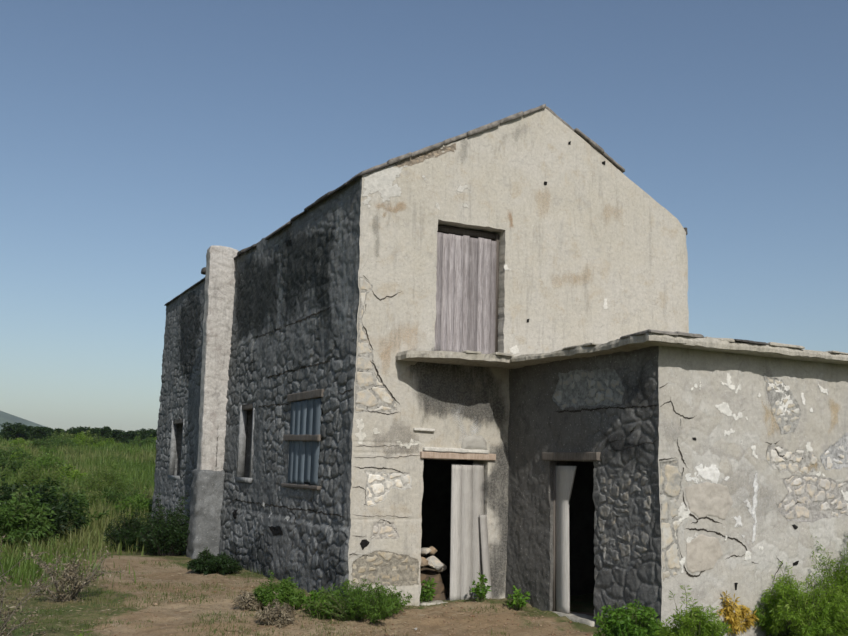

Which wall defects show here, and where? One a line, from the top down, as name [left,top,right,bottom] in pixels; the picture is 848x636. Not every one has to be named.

flaking render [362,143,456,208]
leakage [236,231,332,338]
crack [338,275,402,415]
leakage [411,362,505,426]
flaking render [552,368,625,410]
flaking render [758,373,813,435]
flaking render [365,470,412,507]
leakage [484,445,509,598]
flaking render [597,460,730,581]
crack [554,384,783,581]
flaking render [741,432,848,523]
flaking render [351,550,420,587]